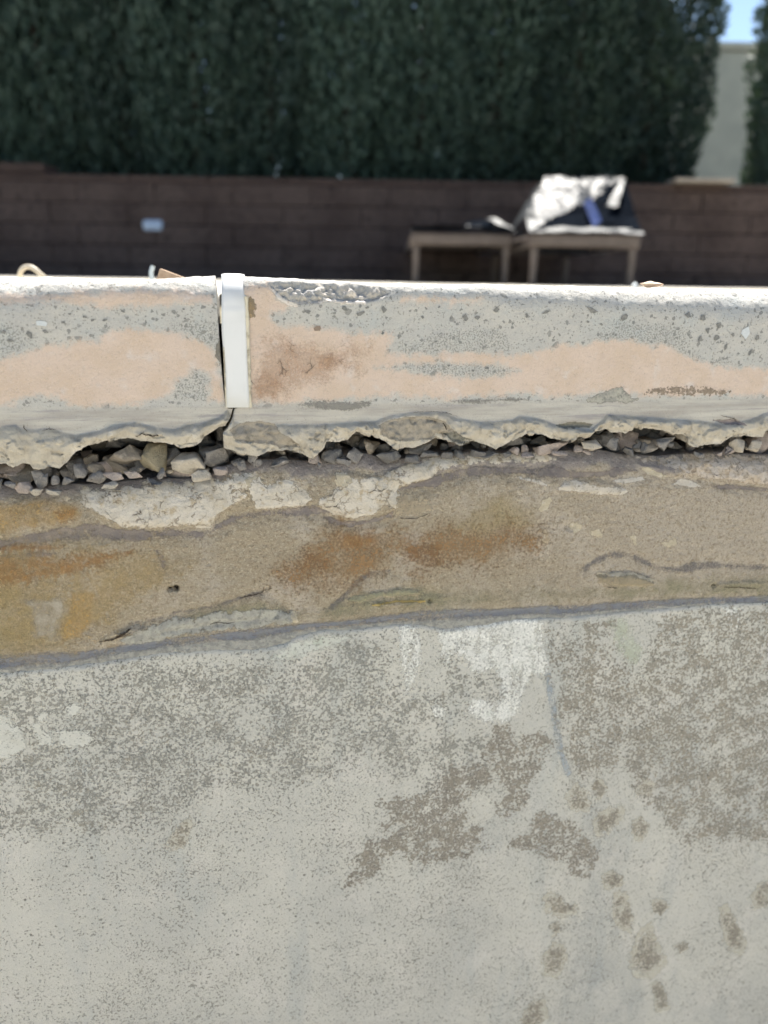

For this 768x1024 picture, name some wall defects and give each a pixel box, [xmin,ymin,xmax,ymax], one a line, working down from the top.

spalling [230,421,300,449]
spalling [379,416,454,441]
peeling [79,452,556,529]
peeling [519,452,768,512]